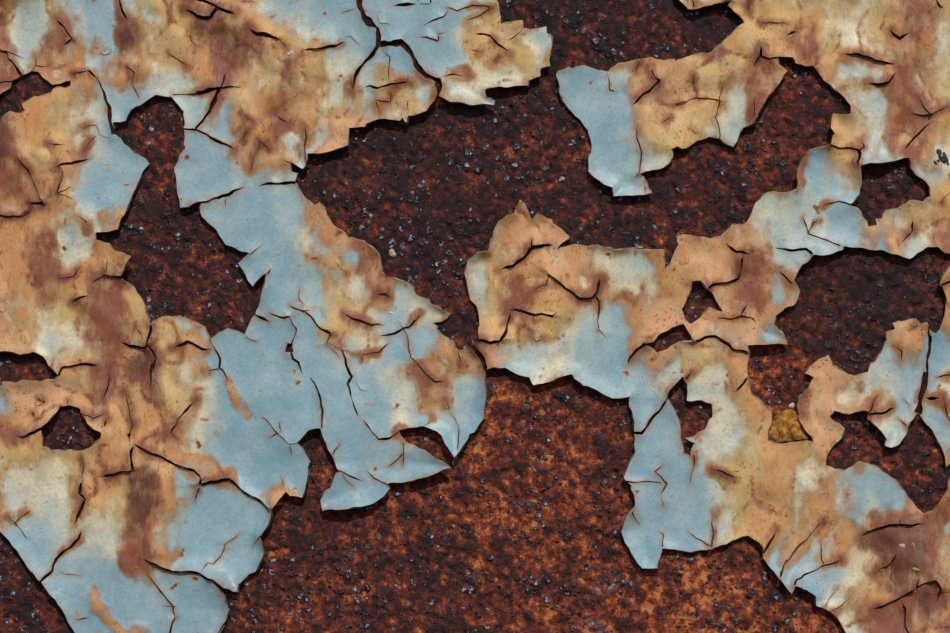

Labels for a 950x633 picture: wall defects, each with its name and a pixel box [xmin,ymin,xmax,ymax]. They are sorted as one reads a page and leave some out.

crack [174,74,297,207]
crack [169,0,523,110]
peeling [556,57,788,197]
peeling [675,0,950,362]
rust [0,492,75,633]
rust [90,586,146,633]
crack [17,363,269,581]
rust [0,0,386,581]
peeling [0,0,553,633]
crack [247,298,459,485]
rust [218,0,950,633]
peeling [789,265,950,467]